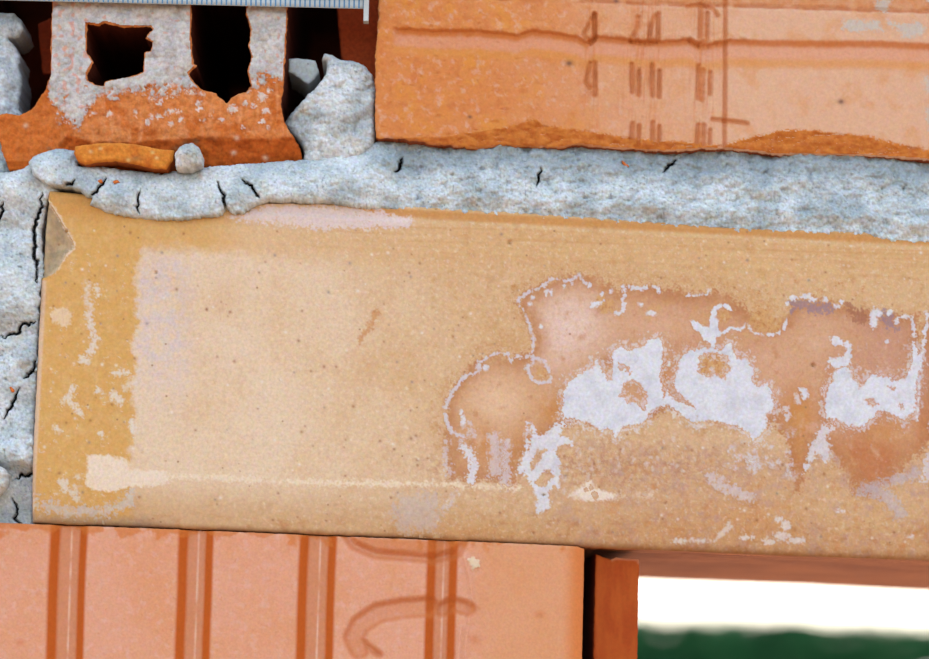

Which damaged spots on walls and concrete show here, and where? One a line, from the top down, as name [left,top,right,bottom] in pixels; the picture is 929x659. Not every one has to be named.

crack [32,194,44,283]
crack [2,321,36,339]
crack [4,361,36,419]
leakage [381,254,929,538]
crack [12,470,33,523]